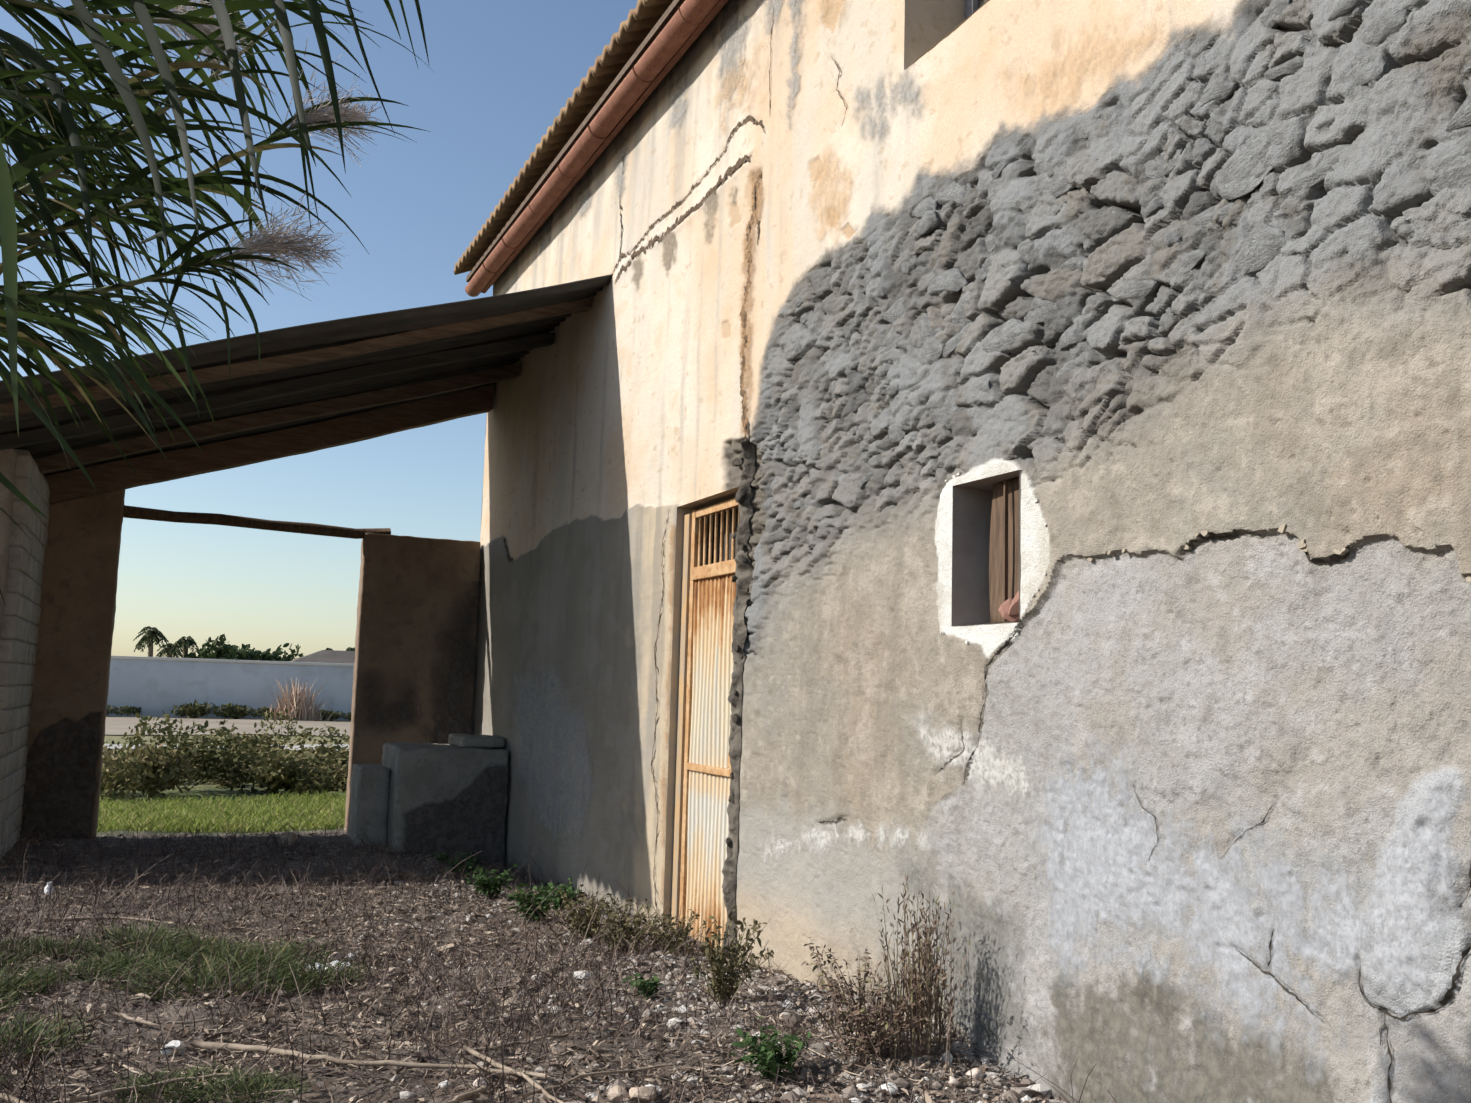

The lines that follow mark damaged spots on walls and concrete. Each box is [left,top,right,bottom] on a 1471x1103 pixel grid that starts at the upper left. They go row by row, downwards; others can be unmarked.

peeling [820,0,844,34]
crack [612,7,774,445]
peeling [807,154,826,184]
peeling [824,203,856,240]
crack [651,513,669,911]
crack [935,626,1020,782]
spalling [914,524,1471,1103]
crack [1459,866,1471,907]
crack [1236,929,1323,1022]
crack [1359,943,1471,1103]